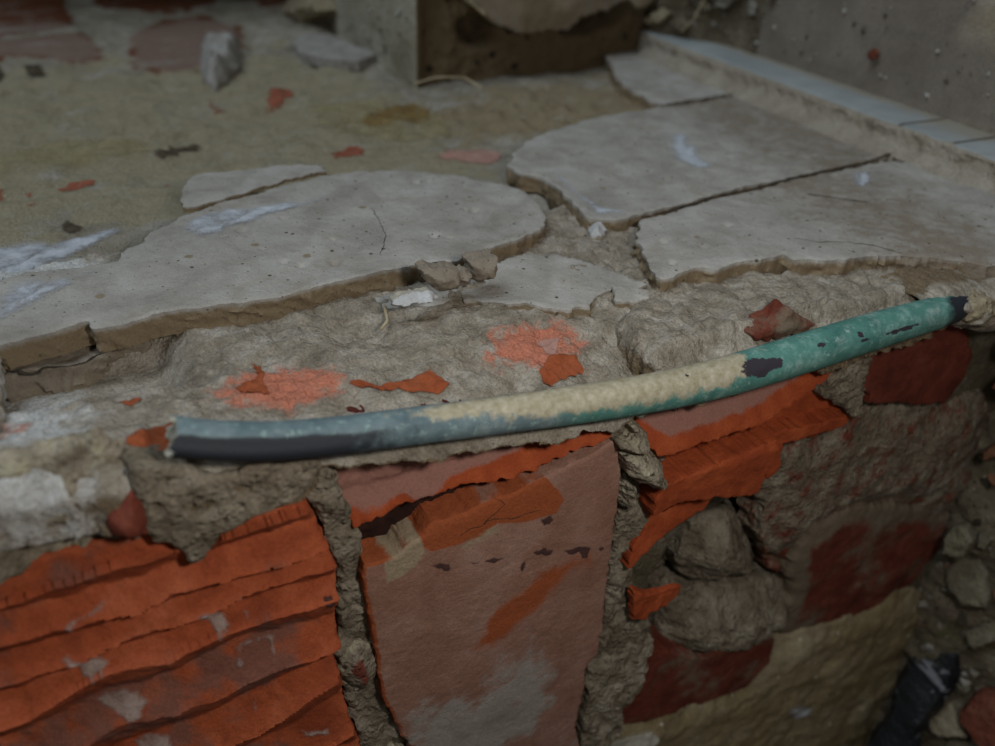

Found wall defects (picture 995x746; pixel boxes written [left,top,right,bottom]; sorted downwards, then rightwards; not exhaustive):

crack [547,197,560,210]
crack [642,153,891,217]
spalling [0,265,995,746]